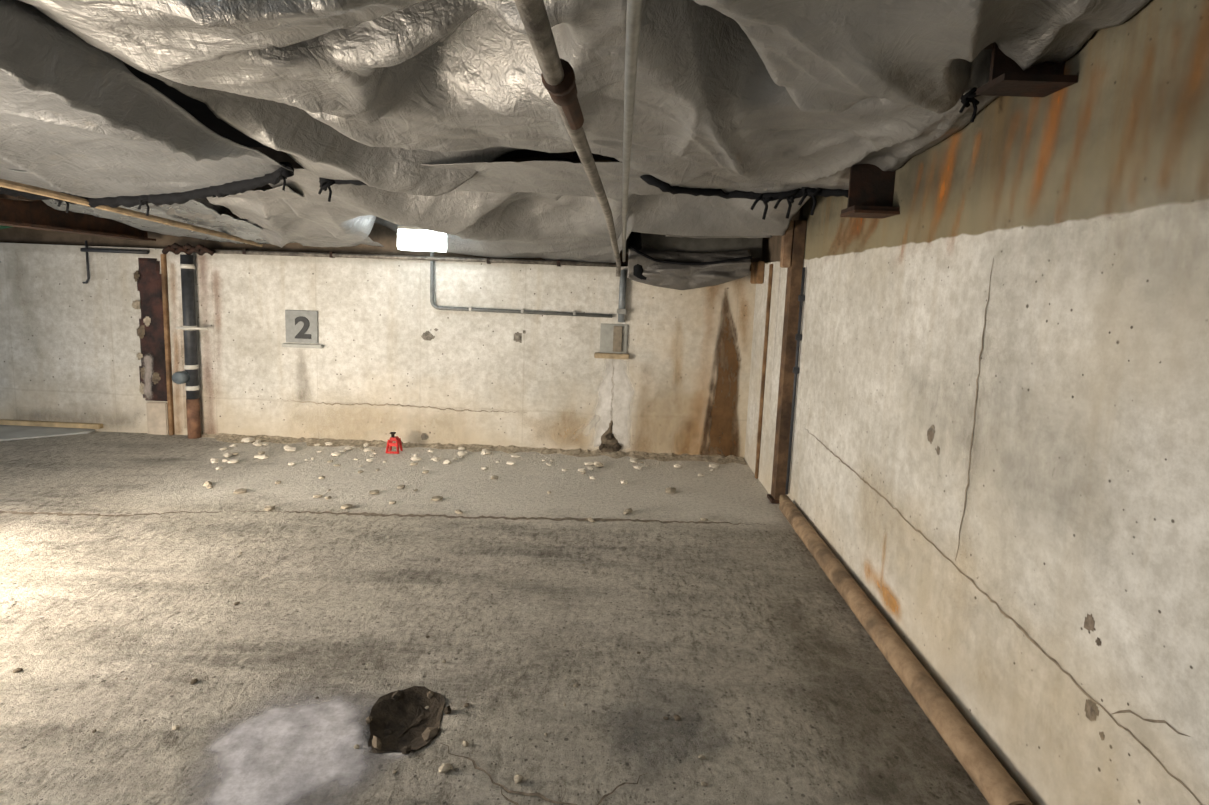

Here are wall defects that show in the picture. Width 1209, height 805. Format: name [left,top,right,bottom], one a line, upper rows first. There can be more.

crack [811,258,1202,805]
corrosion [868,570,898,612]
leakage [194,697,401,805]